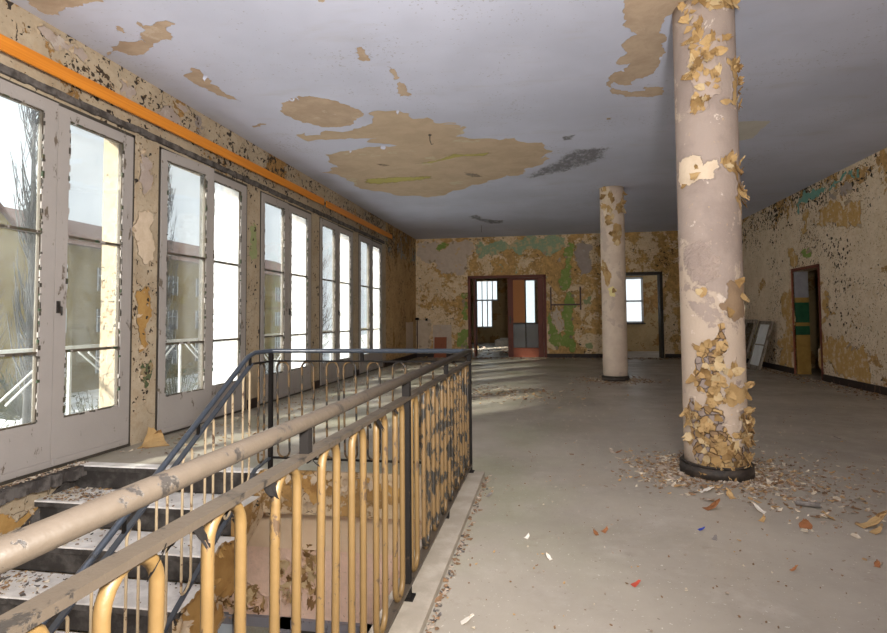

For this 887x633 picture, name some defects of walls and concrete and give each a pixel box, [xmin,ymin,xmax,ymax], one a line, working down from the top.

peeling [605,0,745,117]
peeling [279,95,553,205]
mould [534,149,602,177]
peeling [678,149,750,217]
peeling [547,239,617,354]
peeling [757,166,873,384]
peeling [680,277,756,499]
peeling [260,457,399,516]
peeling [179,590,200,633]
peeling [194,520,234,633]
peeling [246,580,269,615]
peeling [280,544,316,611]